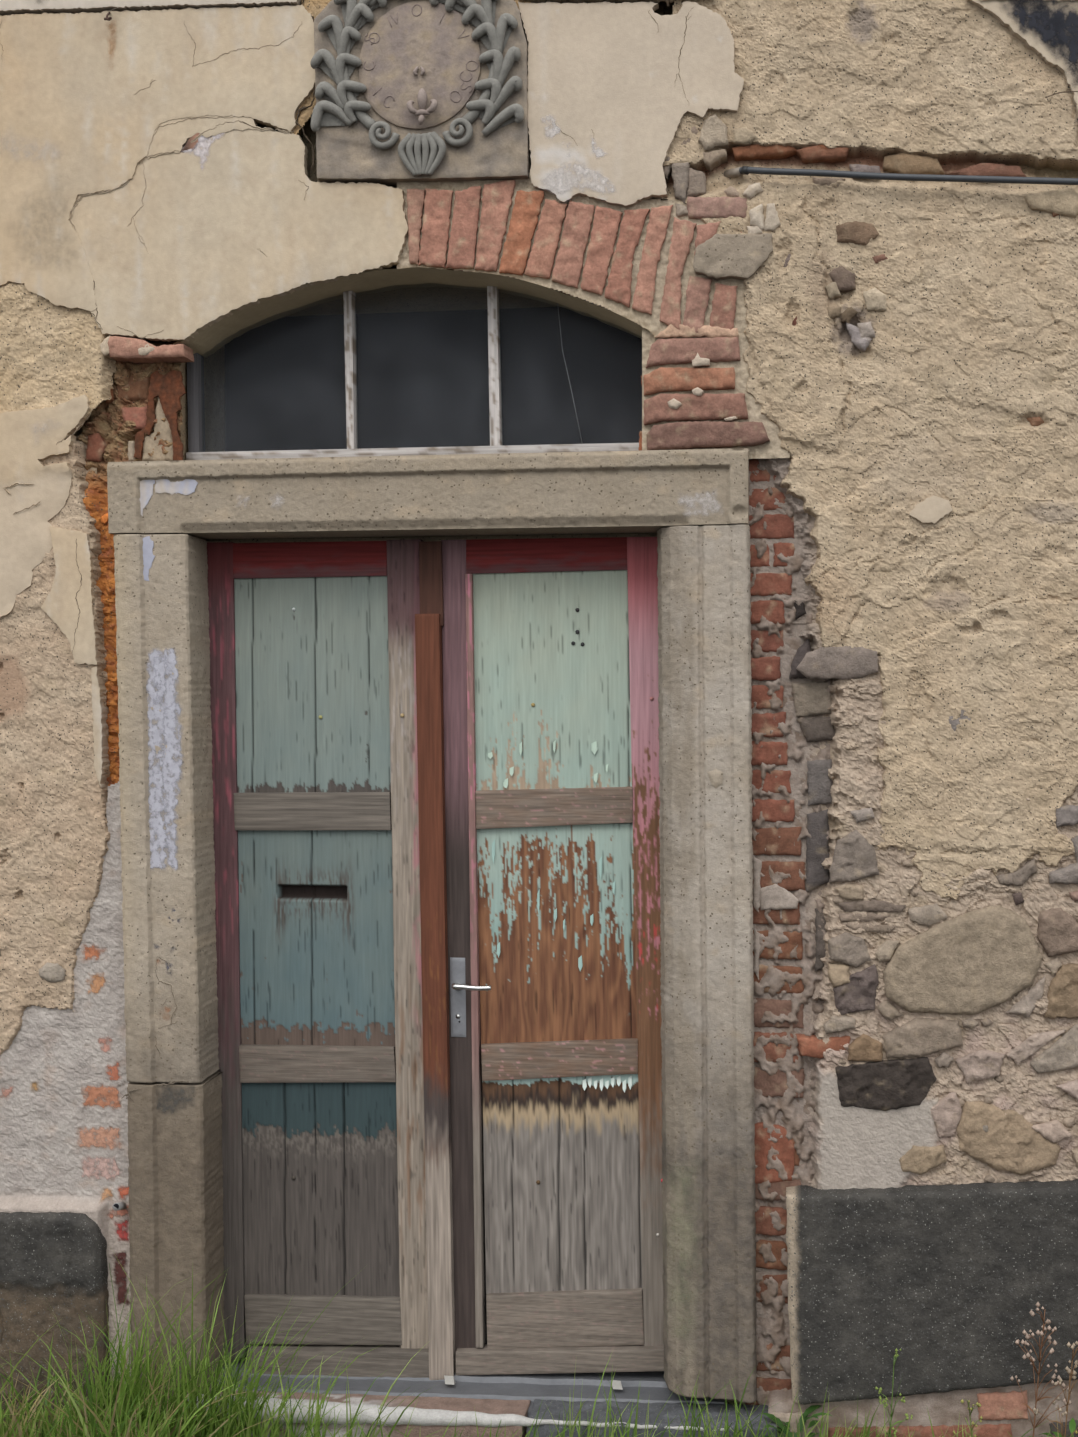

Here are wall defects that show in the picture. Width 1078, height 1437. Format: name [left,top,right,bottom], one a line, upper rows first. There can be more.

spalling [286,92,316,135]
crack [70,89,315,254]
crack [92,280,163,338]
crack [3,482,41,515]
peeling [140,479,198,516]
spalling [397,0,1078,1405]
spalling [0,282,183,1381]